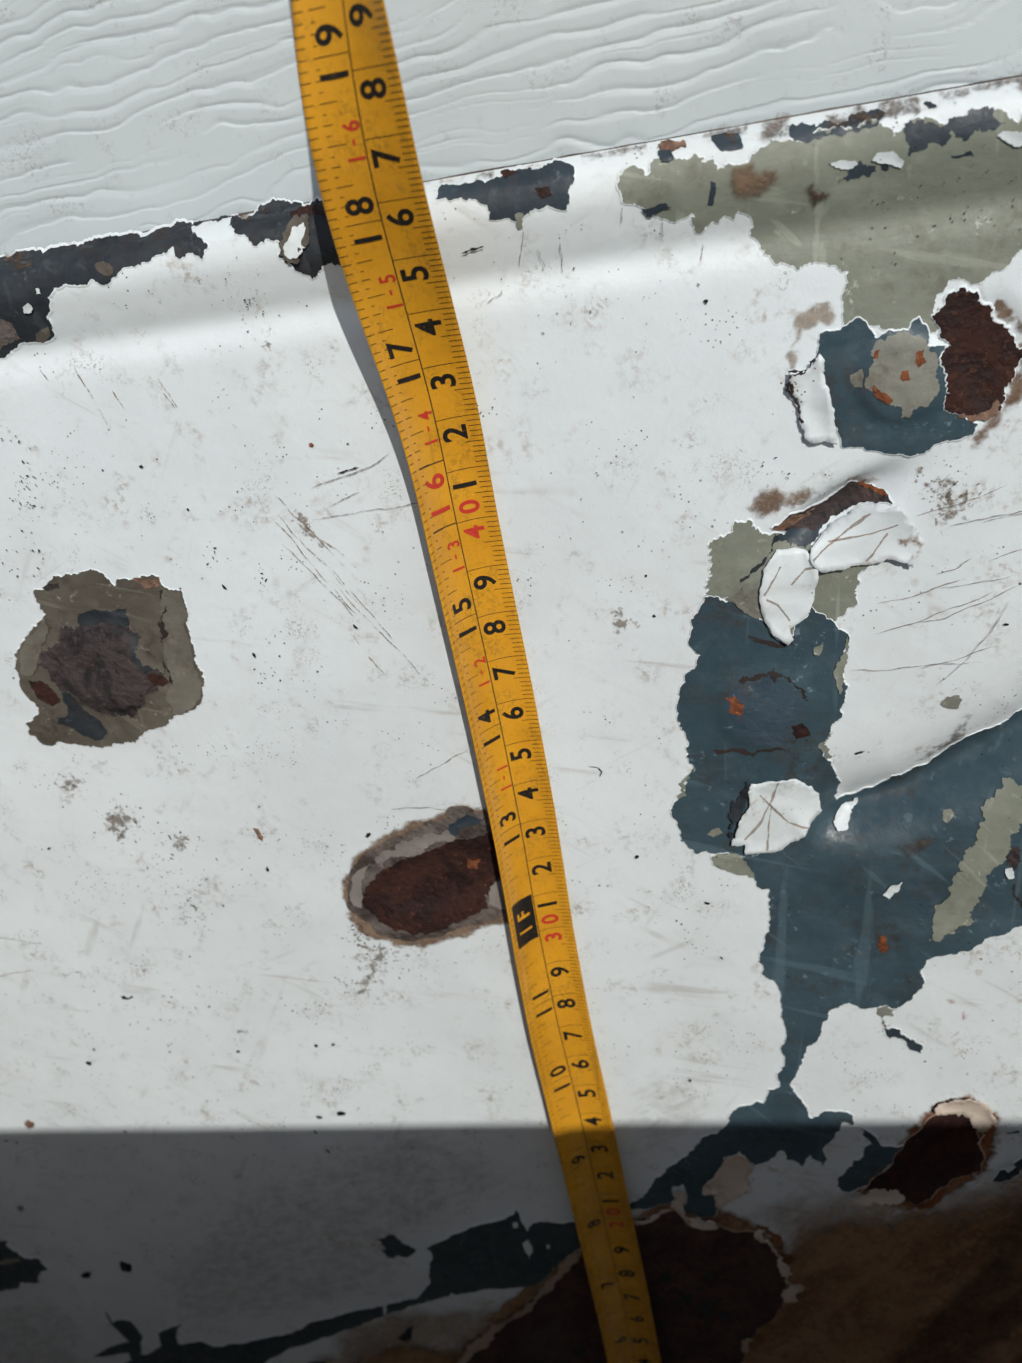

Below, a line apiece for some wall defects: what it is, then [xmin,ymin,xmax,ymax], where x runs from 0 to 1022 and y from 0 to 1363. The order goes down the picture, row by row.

peeling [435,158,576,229]
peeling [0,197,342,360]
peeling [615,101,1022,458]
corrosion [974,300,1022,444]
corrosion [751,489,815,531]
corrosion [852,477,888,496]
peeling [13,568,206,749]
corrosion [342,805,509,947]
peeling [629,518,1022,1218]
corrosion [898,1096,976,1145]
peeling [92,1208,581,1363]
corrosion [633,1113,1022,1363]